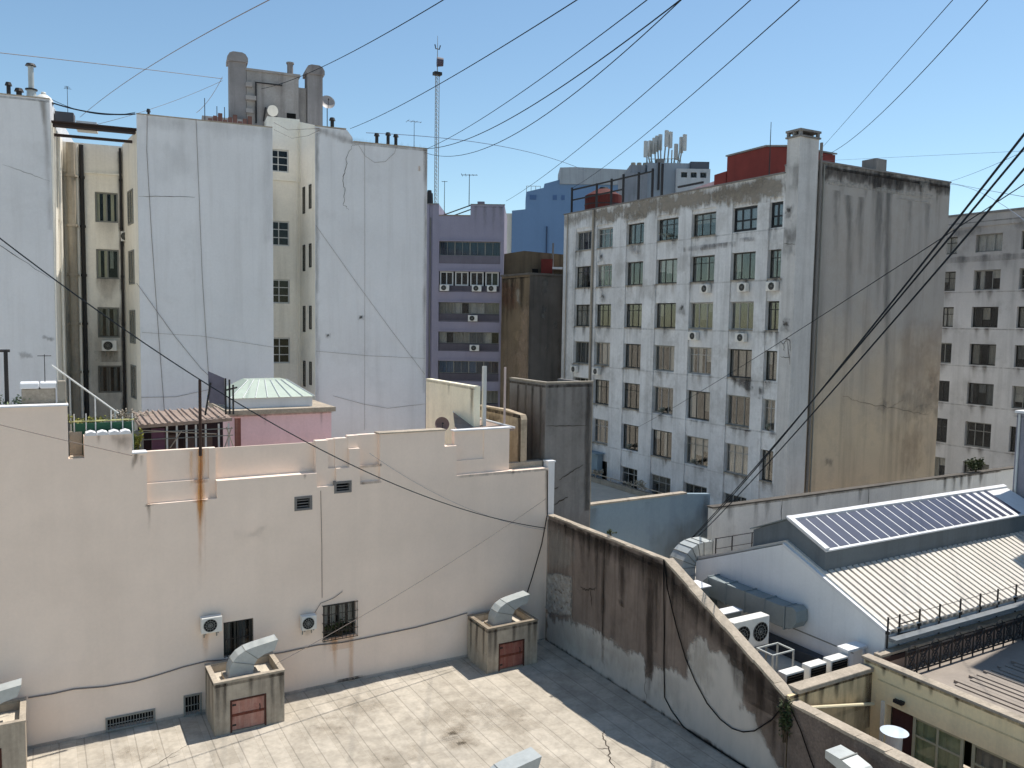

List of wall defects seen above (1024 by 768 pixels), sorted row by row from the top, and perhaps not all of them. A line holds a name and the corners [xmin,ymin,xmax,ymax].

leakage [825,164,949,215]
peeling [545,573,781,768]
leakage [565,525,783,707]